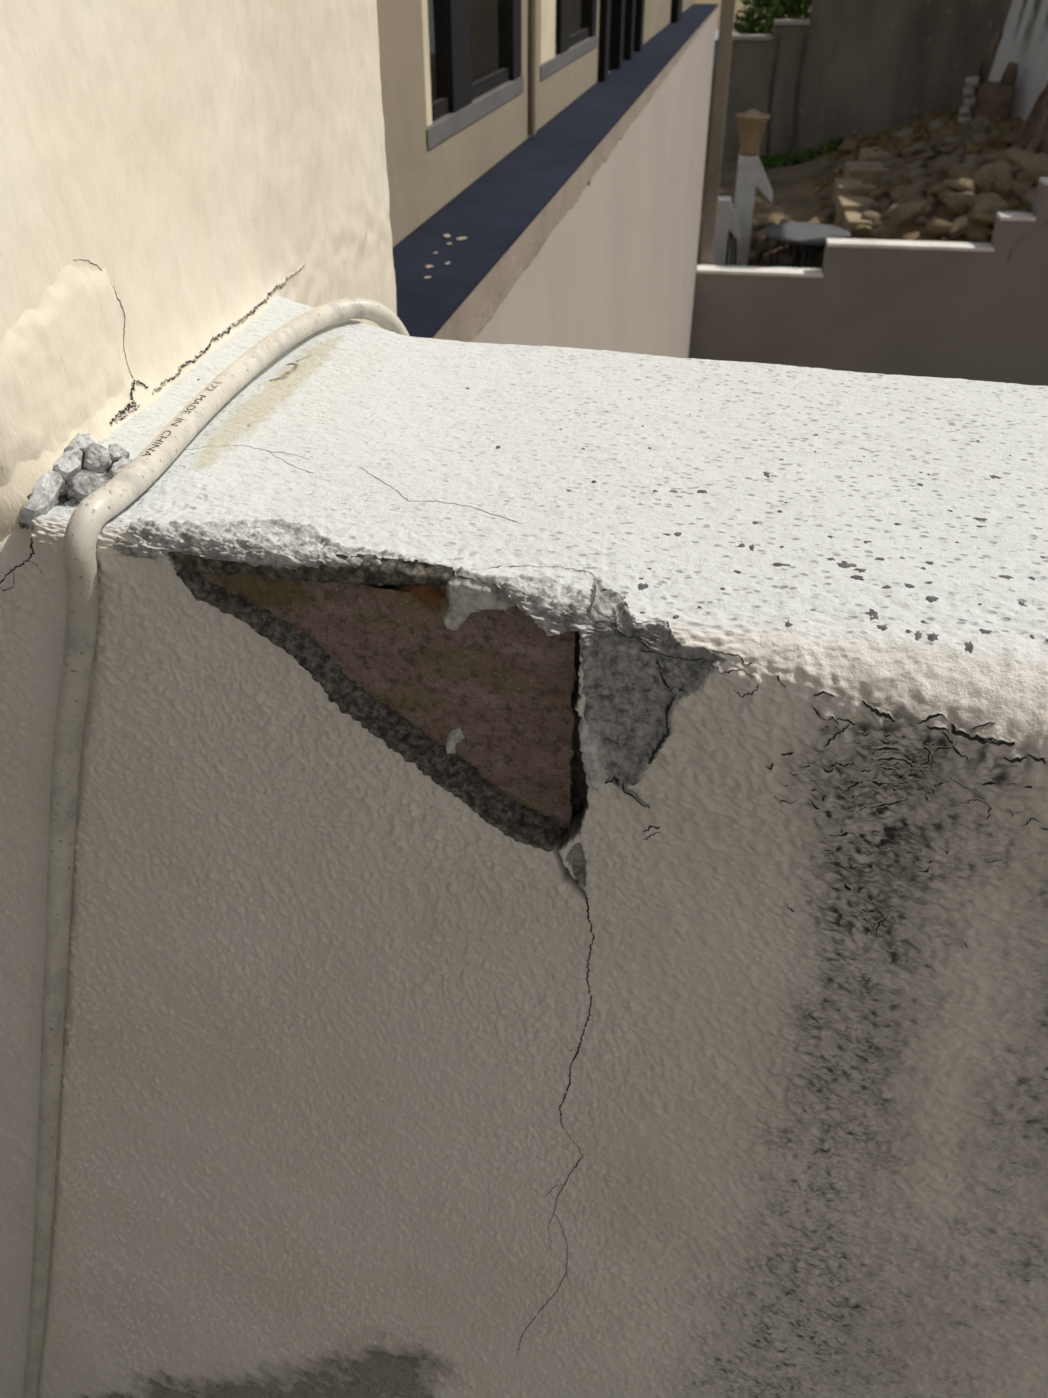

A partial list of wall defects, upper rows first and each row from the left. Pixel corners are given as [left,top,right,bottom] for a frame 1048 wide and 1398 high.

crack [73,258,305,426]
spalling [18,433,134,530]
spalling [826,541,905,581]
spalling [882,547,939,602]
spalling [905,620,939,641]
spalling [964,628,992,654]
spalling [112,516,727,890]
water stain [979,744,1008,785]
water stain [819,714,947,961]
water stain [808,977,887,1093]
crack [516,893,595,1359]
water stain [84,1350,438,1398]